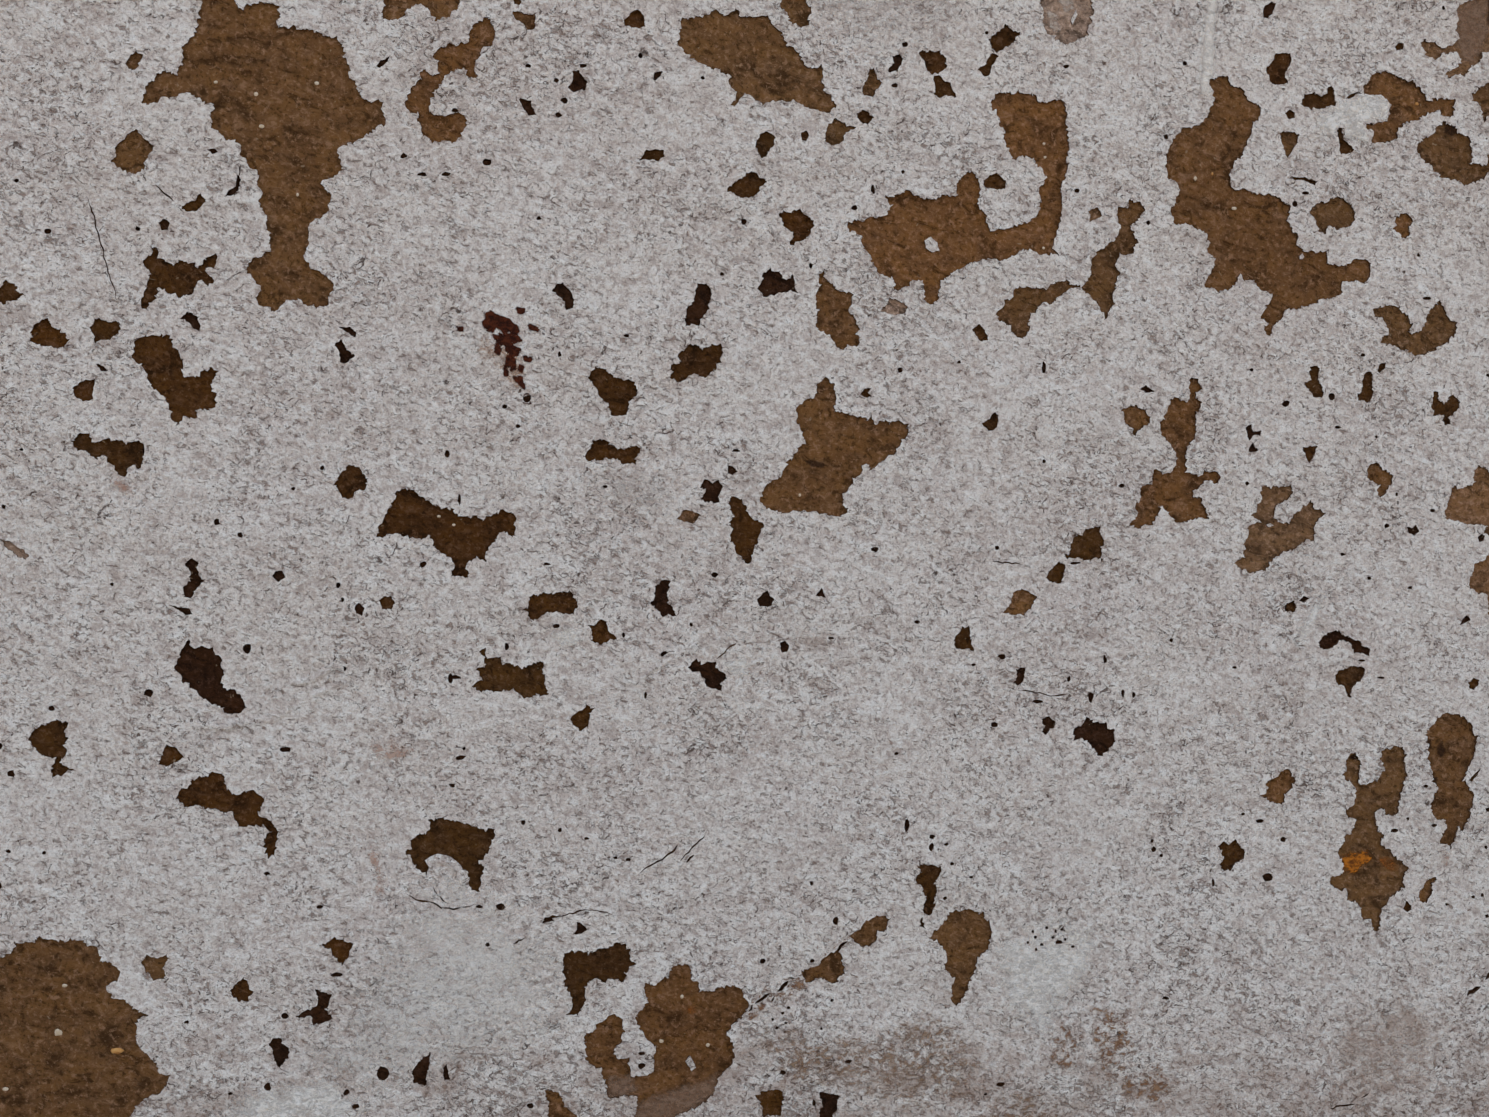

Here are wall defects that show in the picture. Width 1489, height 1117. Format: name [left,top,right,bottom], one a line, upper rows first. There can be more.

peeling [141,0,386,312]
peeling [677,0,956,145]
peeling [847,90,1080,315]
peeling [1165,76,1371,336]
peeling [90,318,218,424]
peeling [377,488,517,578]
peeling [677,377,909,564]
peeling [1118,377,1221,529]
corrosion [1342,851,1395,873]
peeling [1329,746,1437,931]
peeling [0,936,170,1117]
peeling [584,964,749,1117]